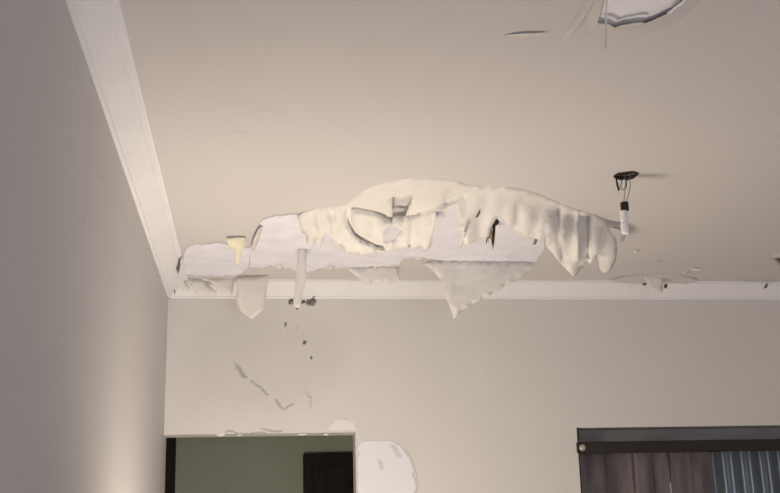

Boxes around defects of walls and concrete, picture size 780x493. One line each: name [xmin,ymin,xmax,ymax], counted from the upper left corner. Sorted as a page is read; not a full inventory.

peeling [586,0,698,53]
peeling [179,178,704,319]
peeling [357,440,416,493]